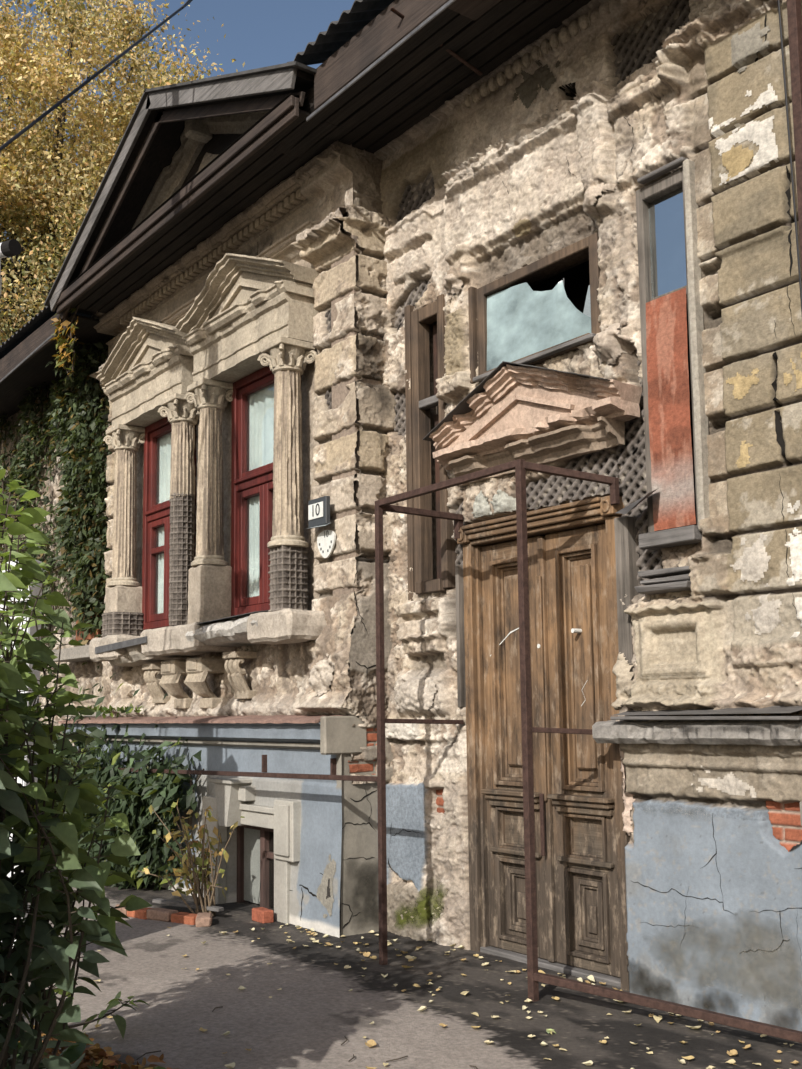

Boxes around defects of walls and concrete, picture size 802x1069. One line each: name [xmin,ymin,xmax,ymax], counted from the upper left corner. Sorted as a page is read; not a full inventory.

peeling [708,83,779,186]
crack [771,165,797,614]
peeling [730,500,802,638]
crack [342,790,419,872]
flaking render [436,789,445,813]
flaking render [691,766,802,852]
crack [290,873,323,920]
flaking render [317,855,336,918]
crack [633,815,802,961]
leakage [631,968,672,1000]
leakage [689,922,800,1028]